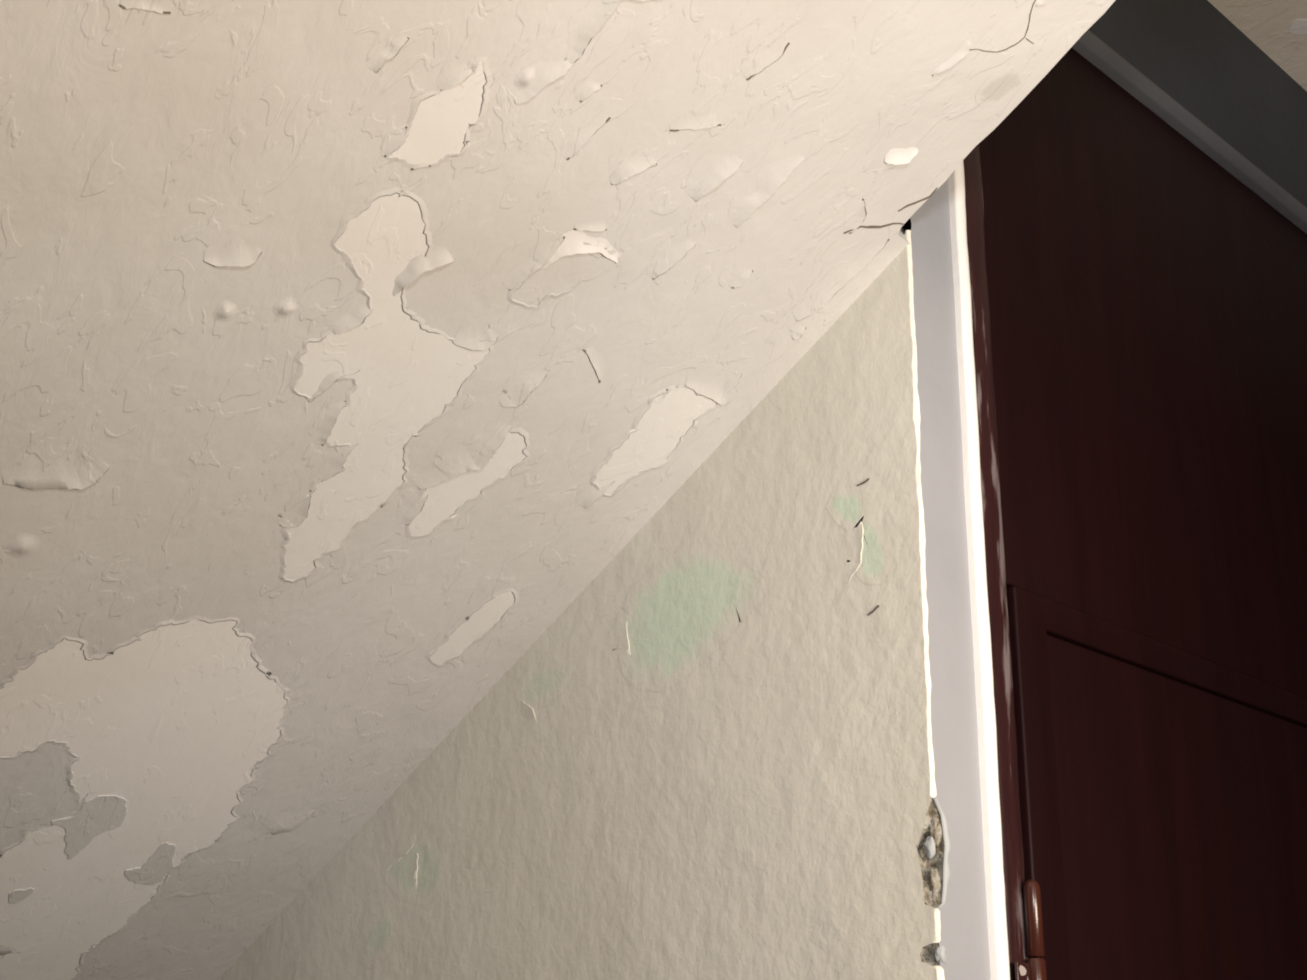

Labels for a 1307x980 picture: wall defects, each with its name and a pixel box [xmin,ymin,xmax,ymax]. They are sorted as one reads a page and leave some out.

crack [969,0,1036,52]
peeling [380,57,493,171]
peeling [204,238,262,267]
peeling [503,218,620,310]
peeling [276,186,532,583]
peeling [575,368,742,508]
peeling [425,588,519,668]
peeling [0,615,292,980]